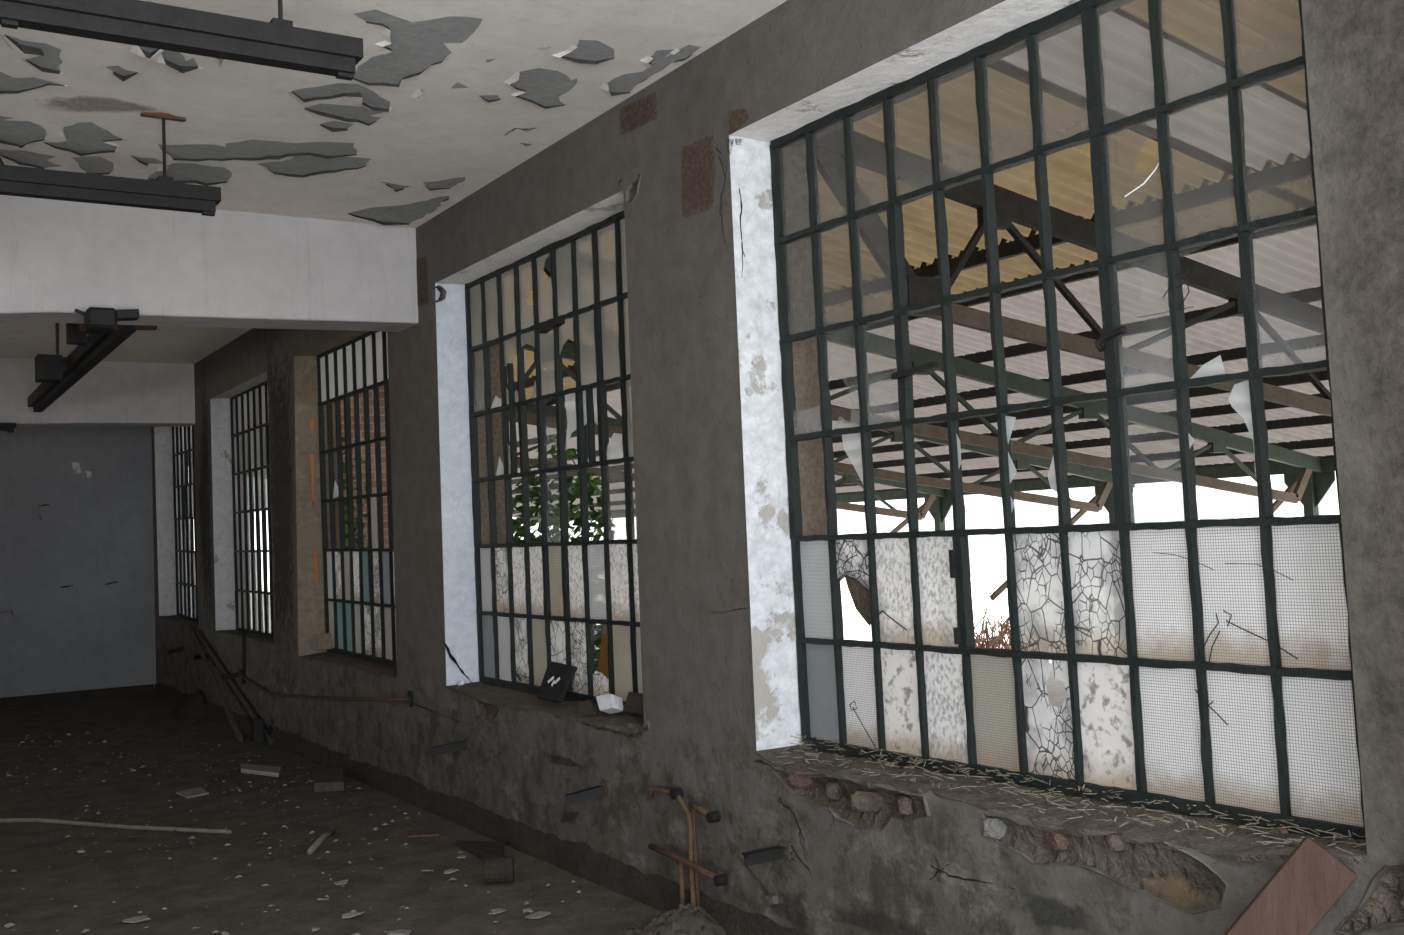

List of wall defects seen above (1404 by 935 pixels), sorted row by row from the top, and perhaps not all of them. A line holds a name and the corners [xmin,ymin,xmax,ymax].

peeling [0,10,482,186]
peeling [346,177,466,225]
crack [777,797,834,878]
crack [929,856,1015,890]